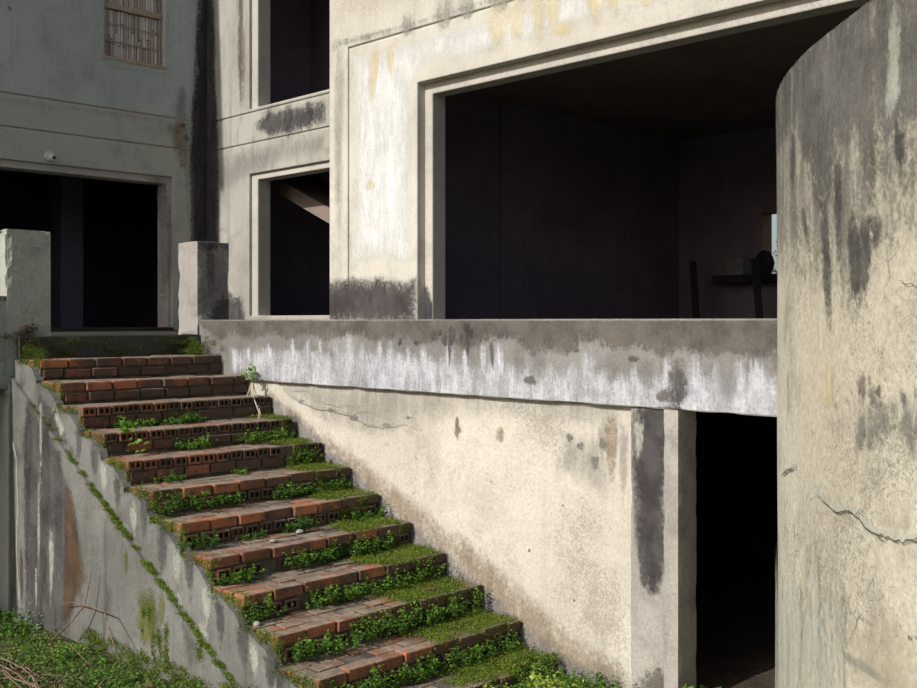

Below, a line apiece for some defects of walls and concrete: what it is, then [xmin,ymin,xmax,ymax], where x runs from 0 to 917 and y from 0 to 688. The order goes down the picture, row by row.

leakage [268,393,623,688]
leakage [169,0,787,594]
leakage [641,667,664,688]
leakage [776,0,917,325]
crack [814,494,917,544]
leakage [855,373,917,452]